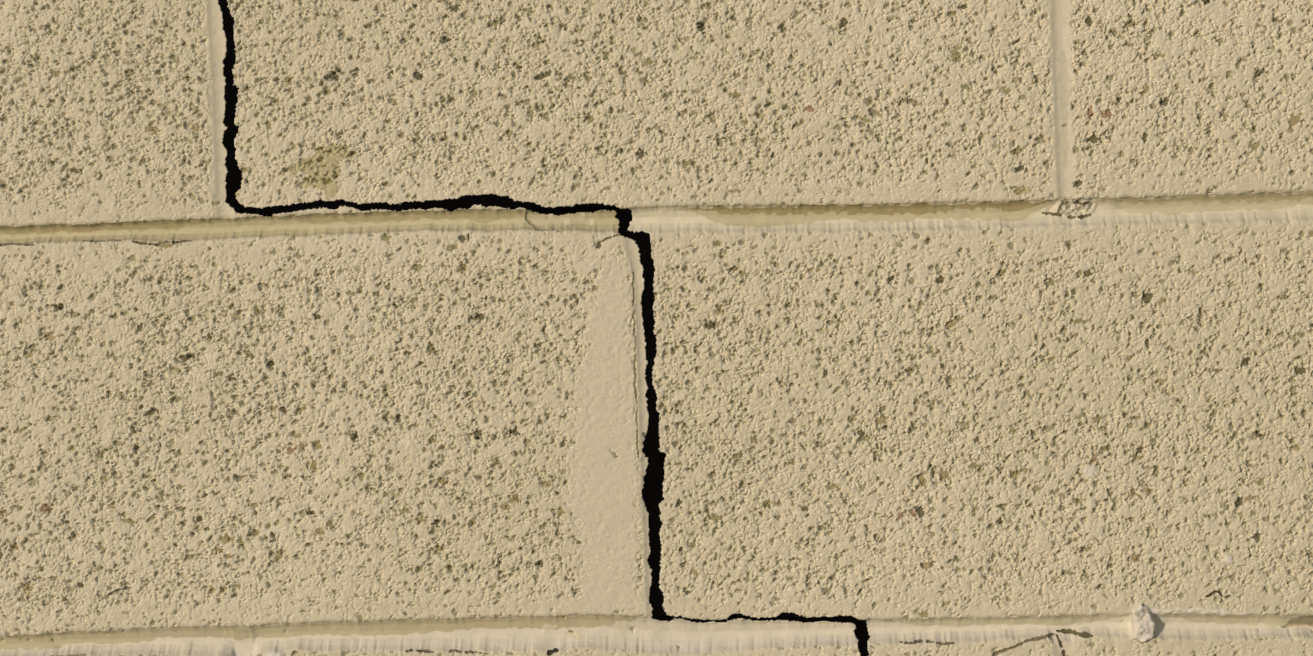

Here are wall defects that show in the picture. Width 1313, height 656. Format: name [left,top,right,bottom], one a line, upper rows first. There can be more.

crack [218,0,955,656]
crack [992,629,1093,656]